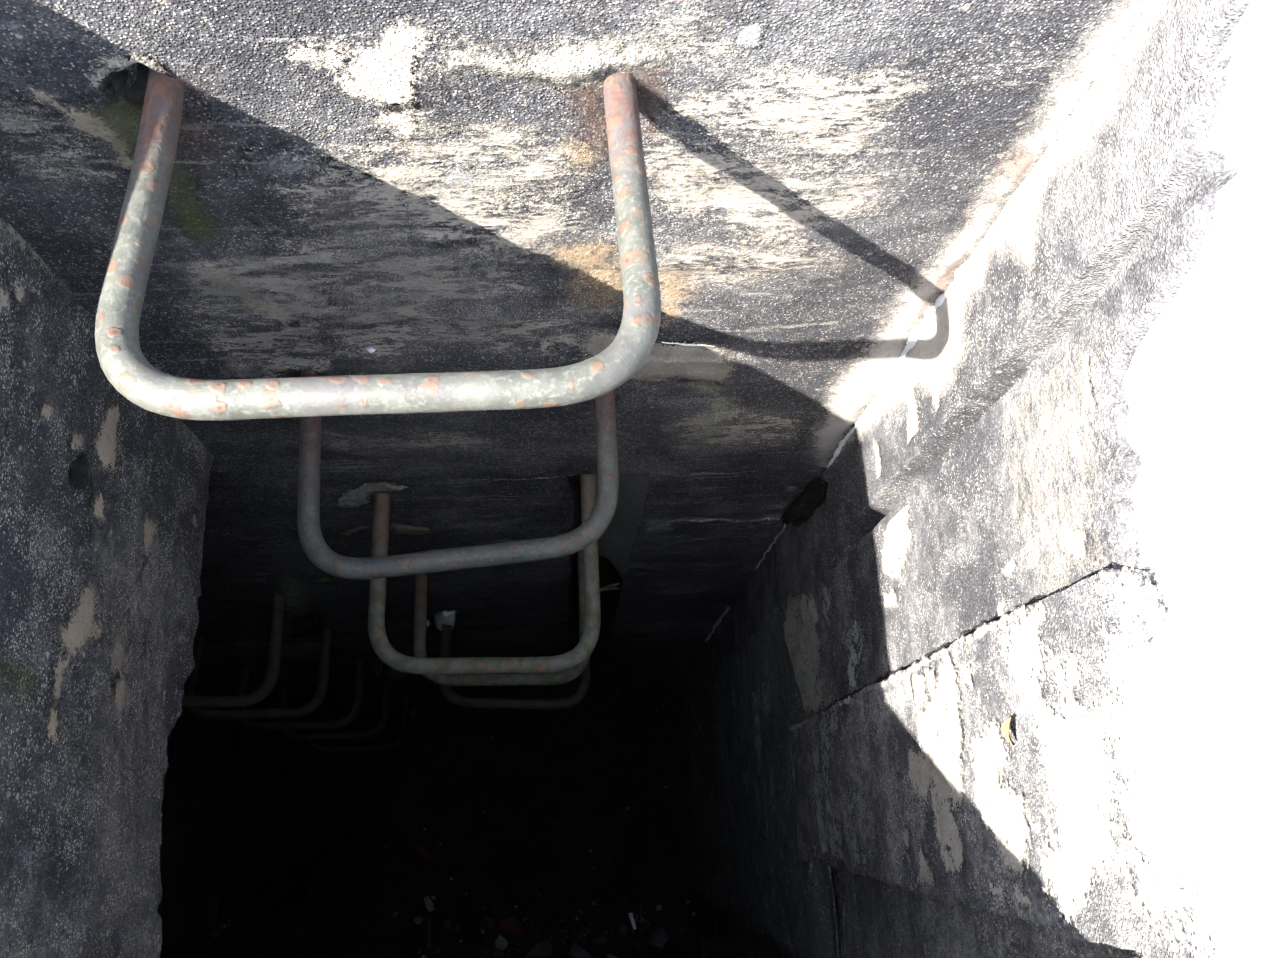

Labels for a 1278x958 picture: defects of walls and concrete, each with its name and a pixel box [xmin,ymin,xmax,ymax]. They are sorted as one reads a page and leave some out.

leakage [738,24,761,46]
leakage [256,154,319,179]
spalling [155,20,598,378]
leakage [0,217,71,293]
rust [555,241,623,310]
rust [659,273,689,318]
leakage [787,82,1097,472]
spalling [881,507,911,607]
leakage [426,610,457,631]
spalling [47,587,102,744]
spalling [111,632,130,714]
spalling [902,602,1124,927]